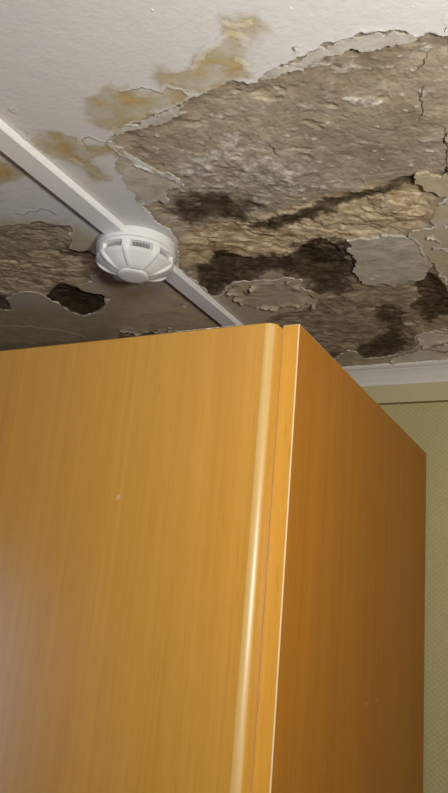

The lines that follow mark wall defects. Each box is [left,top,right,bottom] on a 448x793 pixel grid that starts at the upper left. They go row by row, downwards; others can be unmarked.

damp [159,45,243,100]
damp [93,92,154,125]
damp [44,132,113,178]
flaking render [102,22,448,367]
flaking render [0,217,116,318]
damp [205,278,316,325]